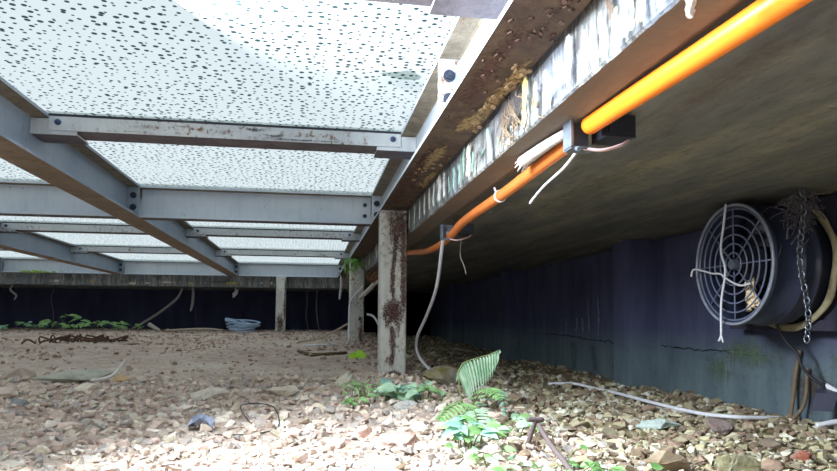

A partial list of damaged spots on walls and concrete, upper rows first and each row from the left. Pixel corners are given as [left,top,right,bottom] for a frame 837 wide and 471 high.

corrosion [447,0,594,133]
corrosion [382,146,450,376]
crack [661,345,767,356]